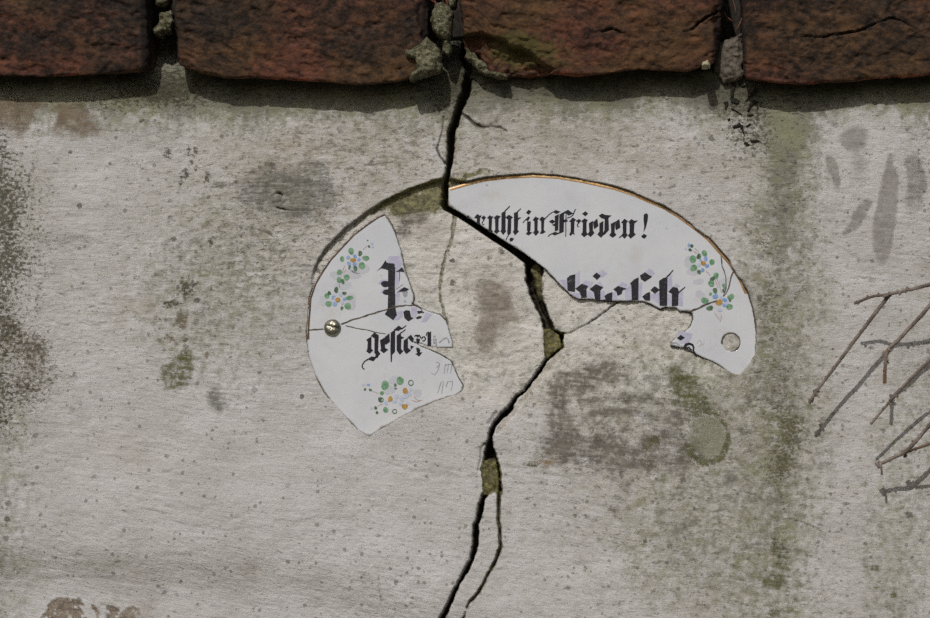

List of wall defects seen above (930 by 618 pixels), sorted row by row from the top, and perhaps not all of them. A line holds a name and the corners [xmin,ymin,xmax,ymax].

crack [799,15,917,40]
damp [0,99,67,441]
crack [434,51,620,618]
peeling [39,599,142,618]